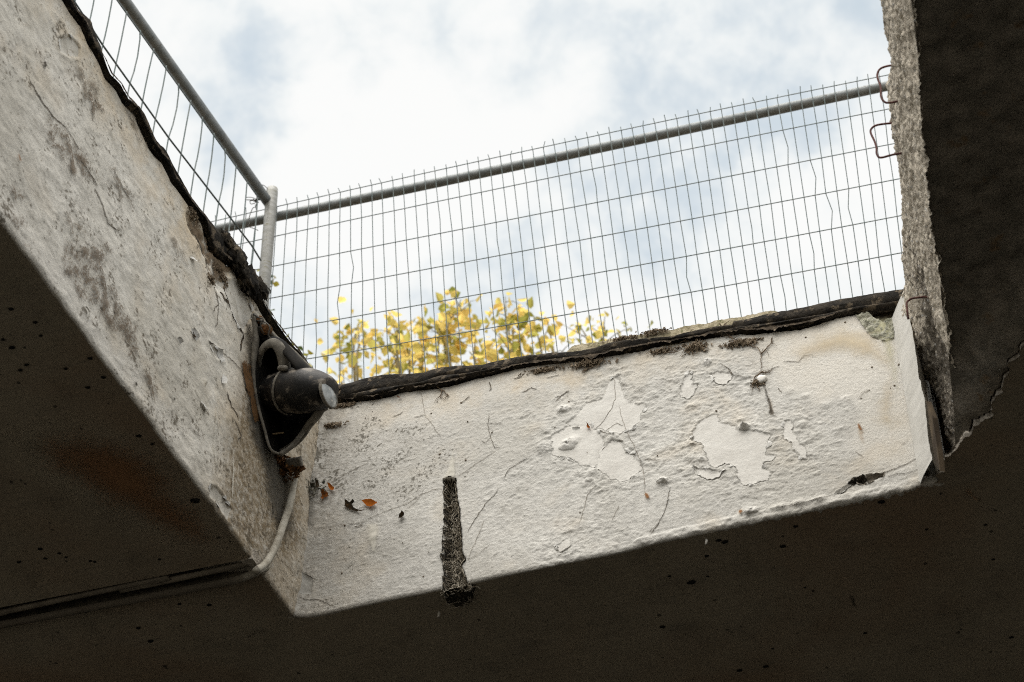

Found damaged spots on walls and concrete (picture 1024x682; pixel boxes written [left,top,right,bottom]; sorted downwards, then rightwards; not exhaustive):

damp [70,65,105,119]
damp [48,113,99,177]
damp [63,211,139,356]
peeling [710,372,732,384]
peeling [551,376,647,482]
peeling [690,415,775,486]
peeling [781,420,807,460]
spalling [834,471,885,495]